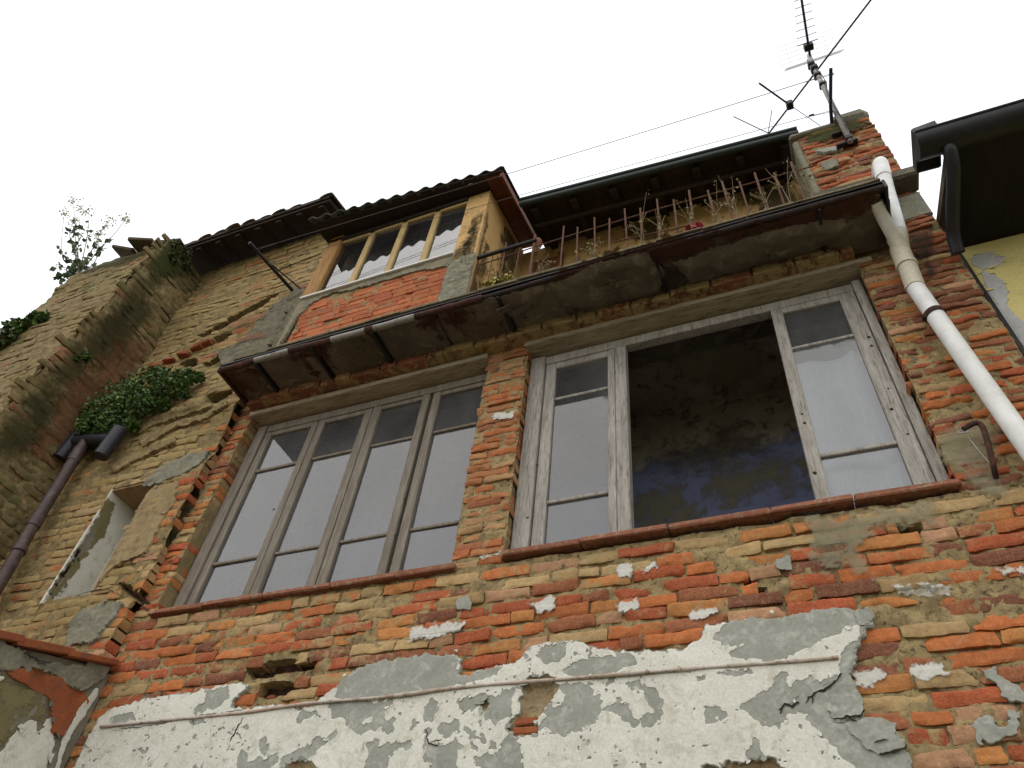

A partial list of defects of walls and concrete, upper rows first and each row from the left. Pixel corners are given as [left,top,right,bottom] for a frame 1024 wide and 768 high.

water stain [454,212,519,292]
peeling [971,251,1024,346]
water stain [0,270,169,455]
crack [80,553,154,596]
peeling [109,712,136,724]
peeling [189,685,229,739]
peeling [236,642,664,768]
peeling [696,608,910,768]
crack [779,673,842,714]